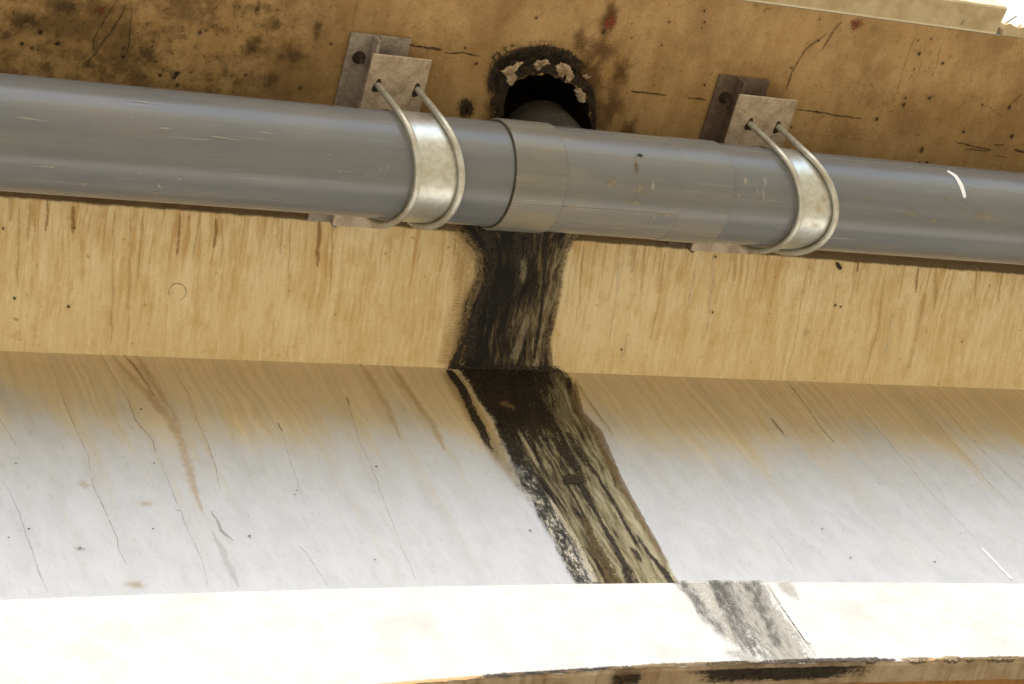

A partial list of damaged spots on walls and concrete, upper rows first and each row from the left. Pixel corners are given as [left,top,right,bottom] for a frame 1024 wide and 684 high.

spalling [487,41,604,131]
damp [446,225,864,684]